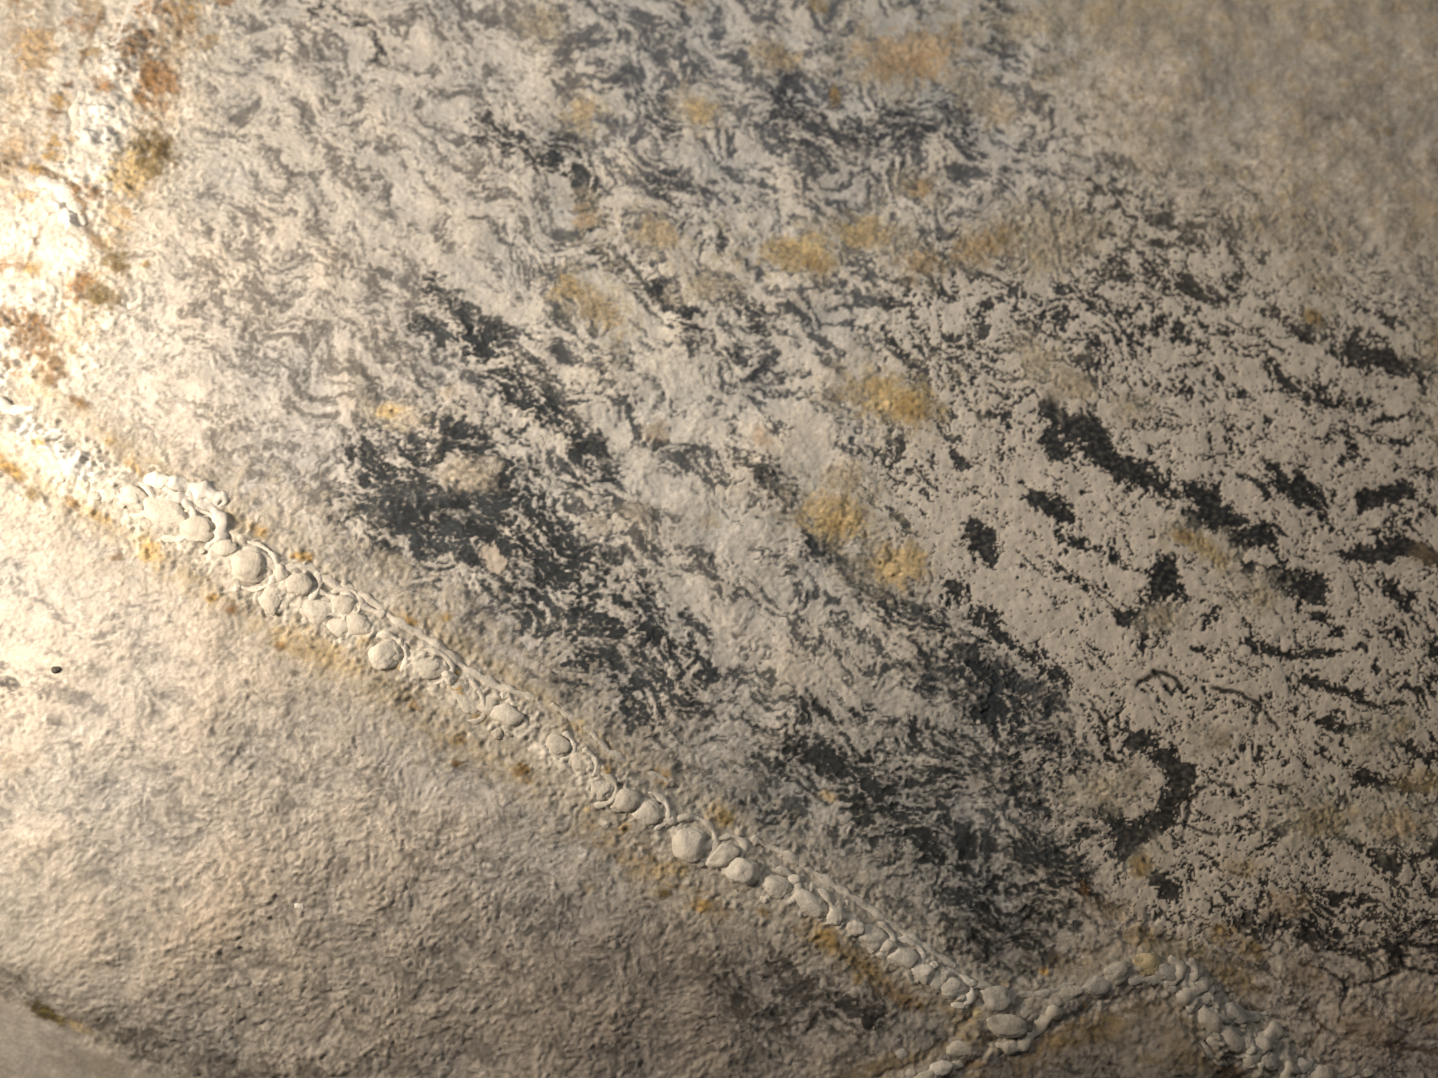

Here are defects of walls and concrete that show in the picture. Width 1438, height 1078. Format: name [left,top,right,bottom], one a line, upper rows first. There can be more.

damp [309,4,386,60]
damp [465,112,783,395]
damp [336,272,719,737]
crack [543,642,566,675]
crack [581,663,598,684]
damp [718,430,1105,962]
crack [1090,669,1279,773]
crack [1175,780,1243,848]
damp [766,960,897,1030]
damp [1233,892,1438,969]
crack [1299,920,1438,1007]
crack [892,1048,909,1061]